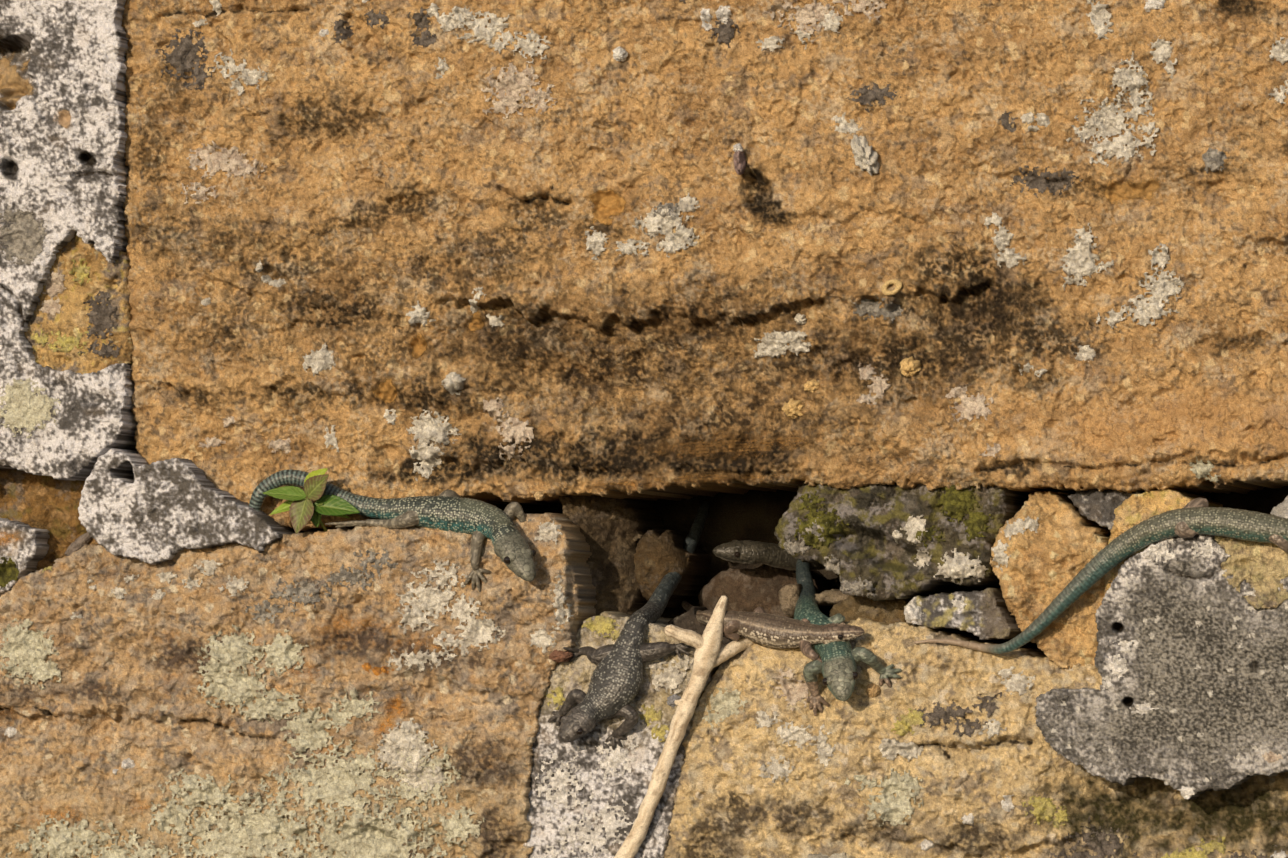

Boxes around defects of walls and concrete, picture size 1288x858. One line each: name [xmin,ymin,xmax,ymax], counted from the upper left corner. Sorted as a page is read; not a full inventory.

crack [3,705,57,717]
crack [181,720,264,739]